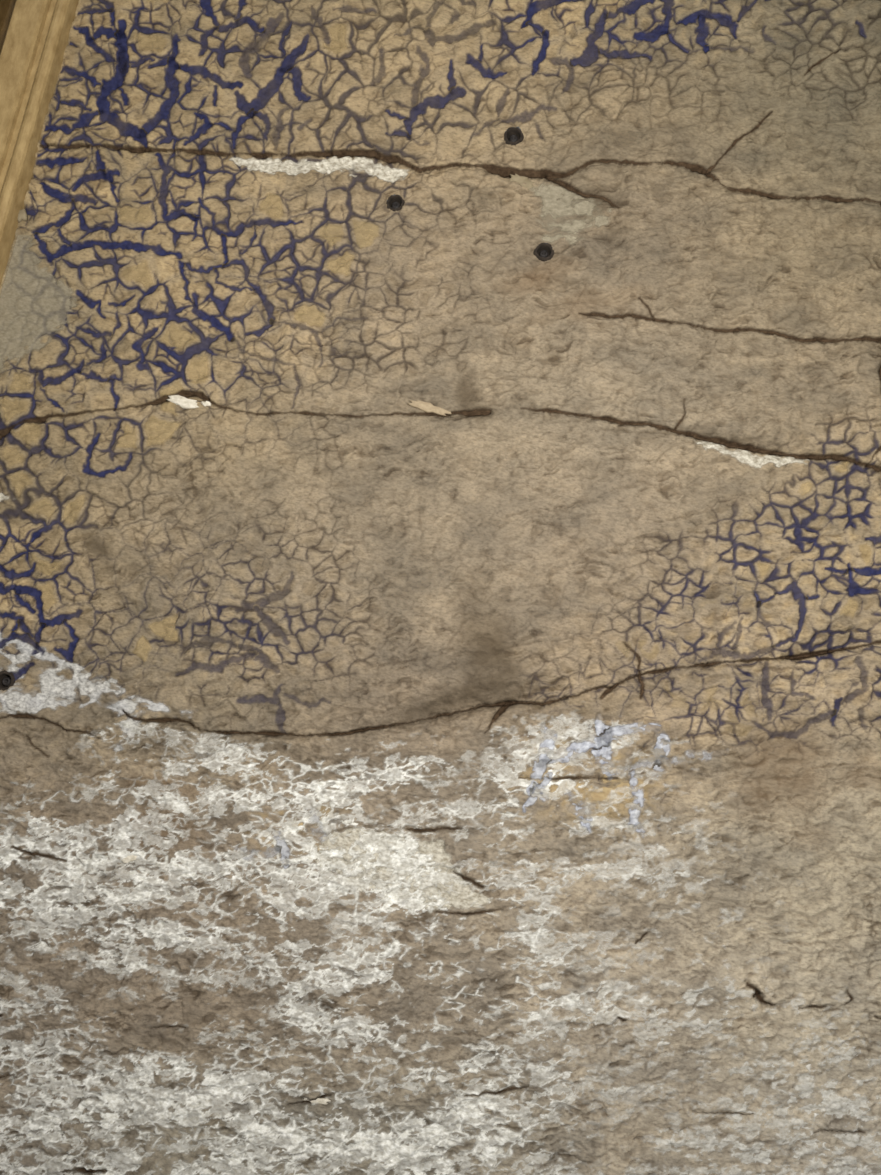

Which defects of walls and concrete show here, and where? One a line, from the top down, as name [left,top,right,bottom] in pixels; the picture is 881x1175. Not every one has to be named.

crack [805,49,841,75]
flaking render [229,156,409,183]
crack [40,112,881,208]
crack [579,298,881,380]
flaking render [166,395,212,409]
crack [0,390,491,440]
crack [524,408,881,472]
crack [123,641,881,736]
crack [0,714,94,757]
damp [0,718,674,1175]
damp [755,1058,881,1175]
damp [655,1131,775,1175]